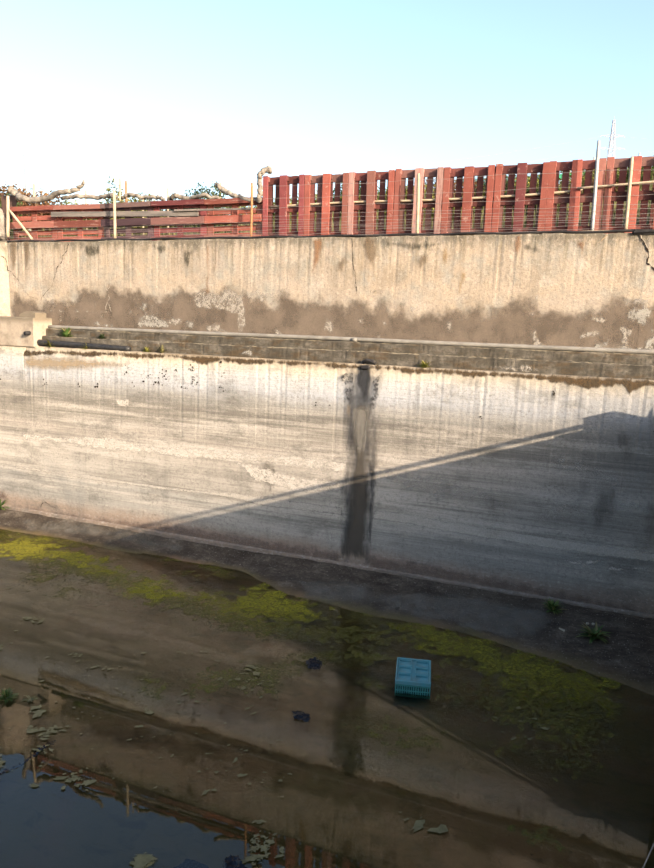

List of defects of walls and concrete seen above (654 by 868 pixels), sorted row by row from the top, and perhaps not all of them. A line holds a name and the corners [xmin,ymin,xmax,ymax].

crack [632,233,654,270]
damp [12,287,654,350]
damp [15,369,654,571]